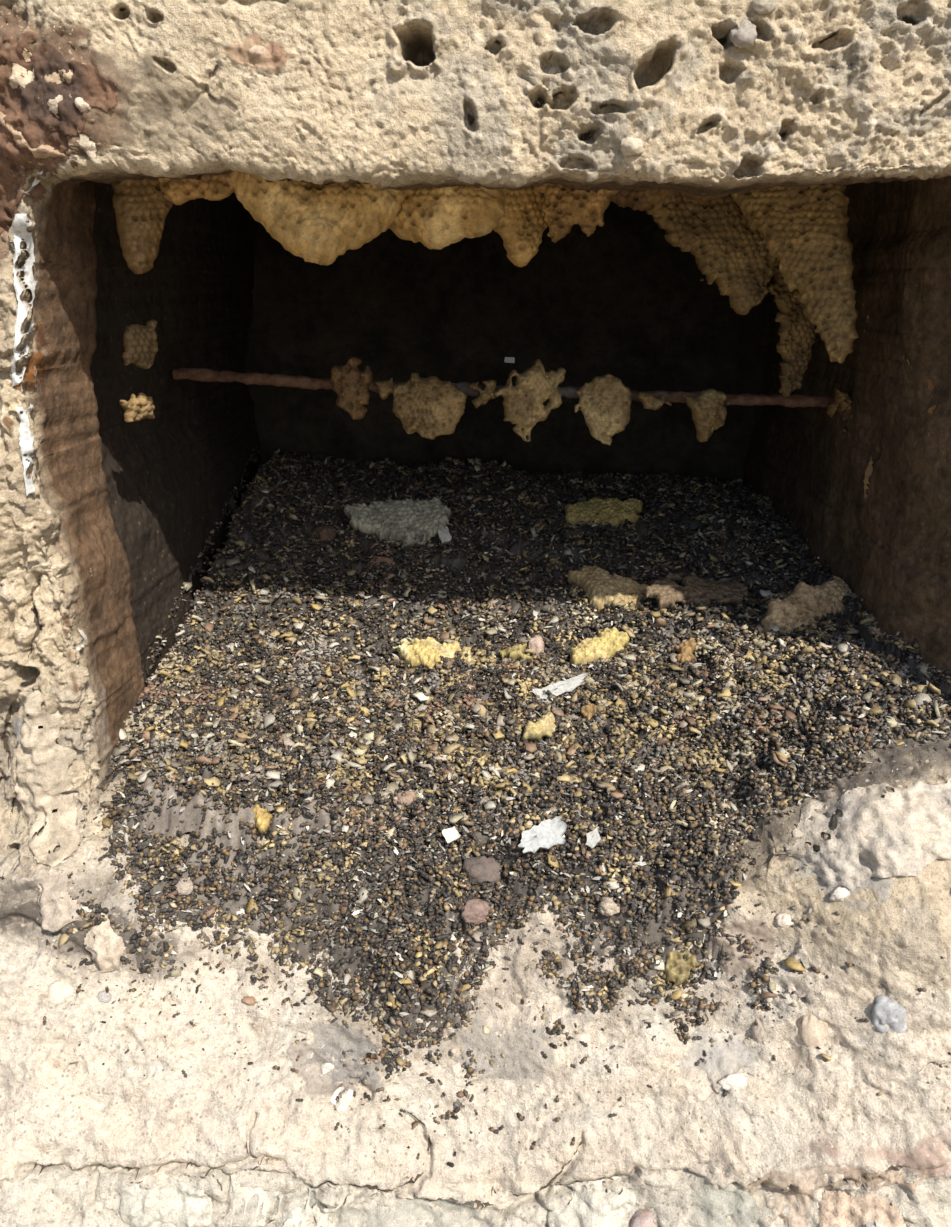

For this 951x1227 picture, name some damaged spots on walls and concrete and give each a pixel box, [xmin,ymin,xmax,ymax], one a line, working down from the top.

crack [32,1142,275,1191]
crack [286,1111,582,1214]
crack [863,1141,951,1180]